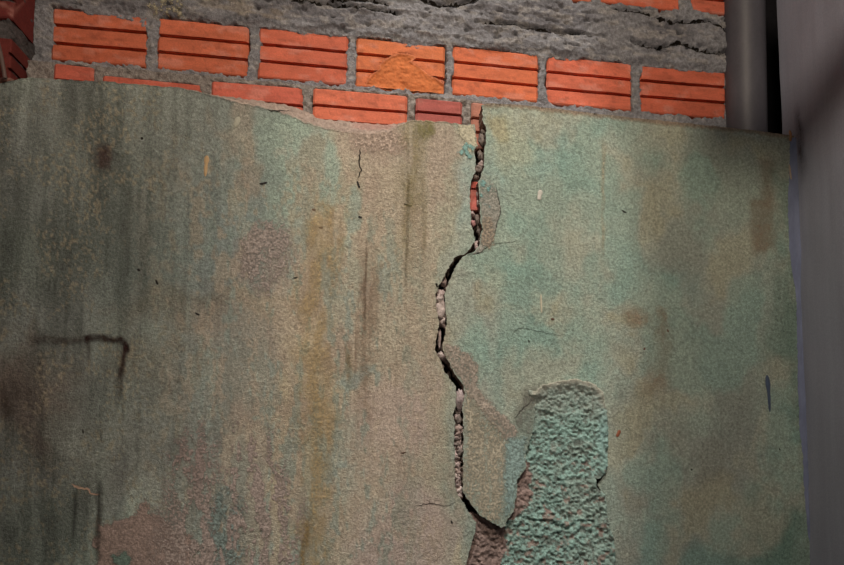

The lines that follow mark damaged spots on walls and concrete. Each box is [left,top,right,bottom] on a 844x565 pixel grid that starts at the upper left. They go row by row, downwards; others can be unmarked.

crack [291,0,396,16]
crack [421,0,478,8]
crack [482,22,592,37]
crack [615,8,725,55]
spalling [366,53,444,94]
peeling [475,180,500,253]
crack [416,129,515,513]
flaking render [444,344,616,565]
peeling [92,420,307,565]